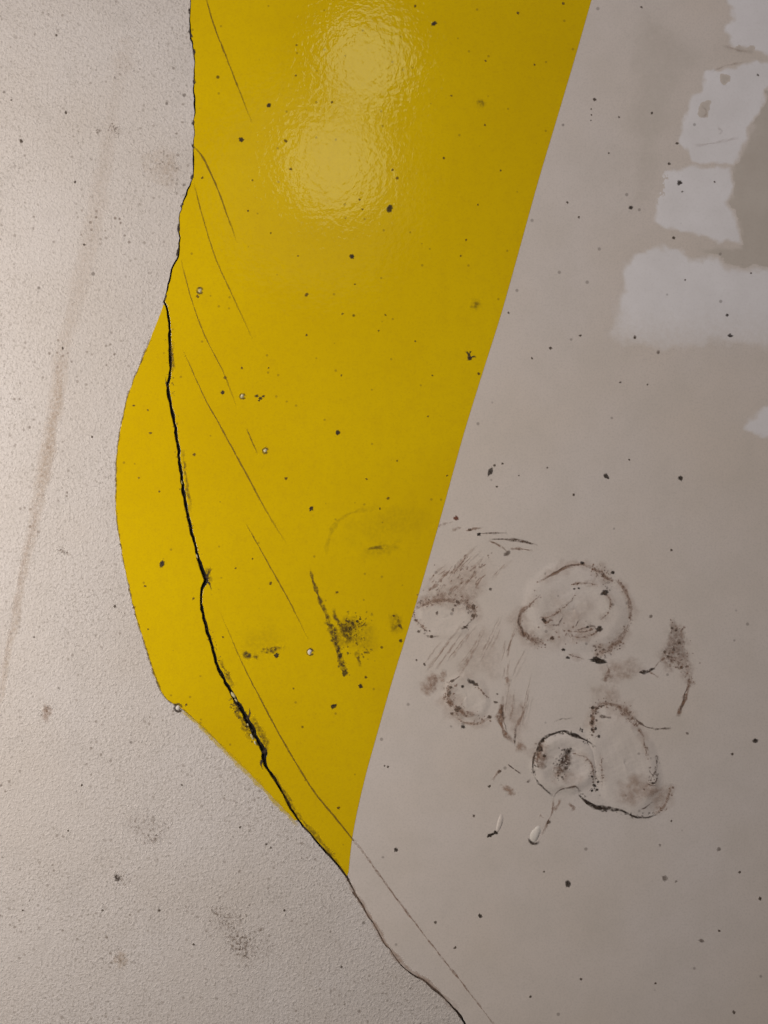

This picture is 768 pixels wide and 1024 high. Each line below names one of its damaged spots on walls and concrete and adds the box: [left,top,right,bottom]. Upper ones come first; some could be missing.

crack [163,0,466,1024]
peeling [601,0,768,356]